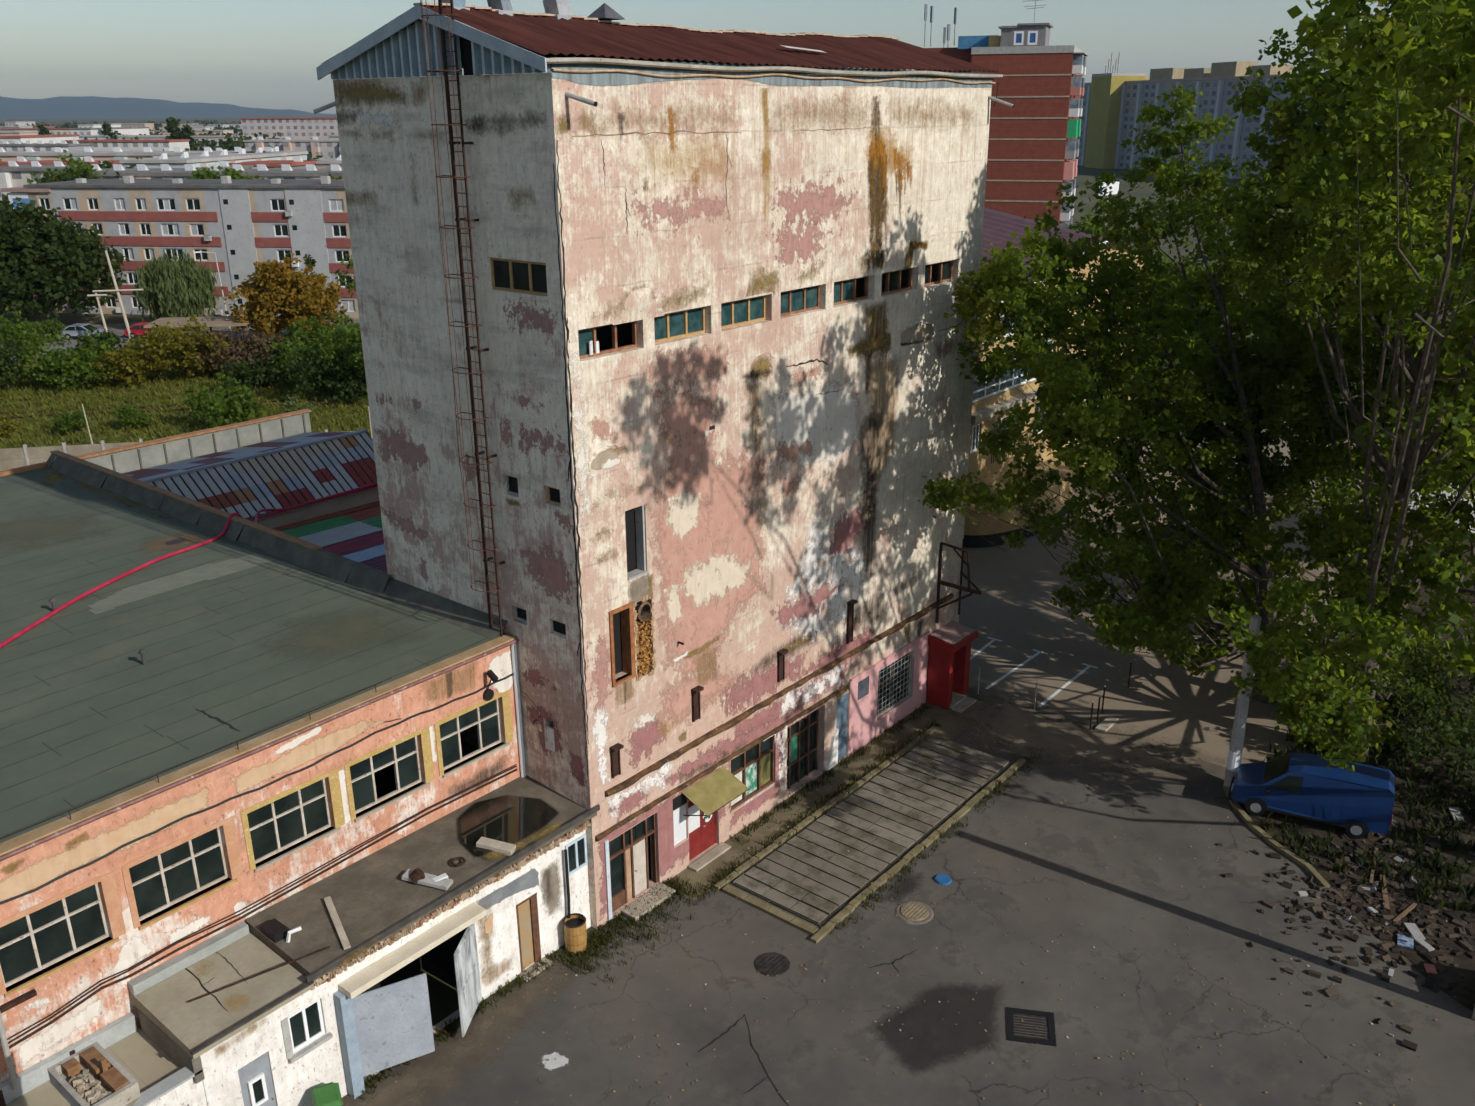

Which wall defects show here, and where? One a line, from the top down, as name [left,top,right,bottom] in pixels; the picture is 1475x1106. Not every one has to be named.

leakage [652,108,676,164]
peeling [631,172,730,244]
peeling [766,169,858,282]
corrosion [861,98,912,268]
peeling [503,298,562,335]
flaking render [900,321,956,358]
peeling [375,426,427,473]
leakage [860,359,897,576]
peeling [488,344,918,920]
flaking render [271,726,322,755]
flaking render [429,725,437,762]
flaking render [339,770,351,827]